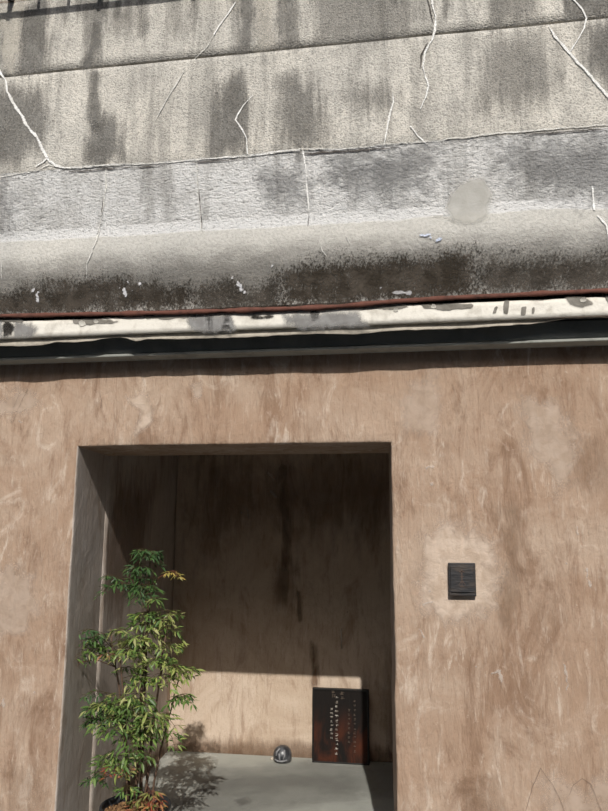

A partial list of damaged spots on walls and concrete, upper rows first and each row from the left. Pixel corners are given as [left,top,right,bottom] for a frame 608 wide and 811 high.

damp [0,87,46,163]
damp [0,0,48,76]
damp [78,0,125,165]
damp [209,73,248,159]
damp [233,0,255,53]
damp [277,0,297,46]
damp [278,75,321,156]
crack [0,0,608,278]
damp [332,153,430,189]
damp [564,0,608,17]
damp [589,24,608,79]
damp [0,242,608,320]